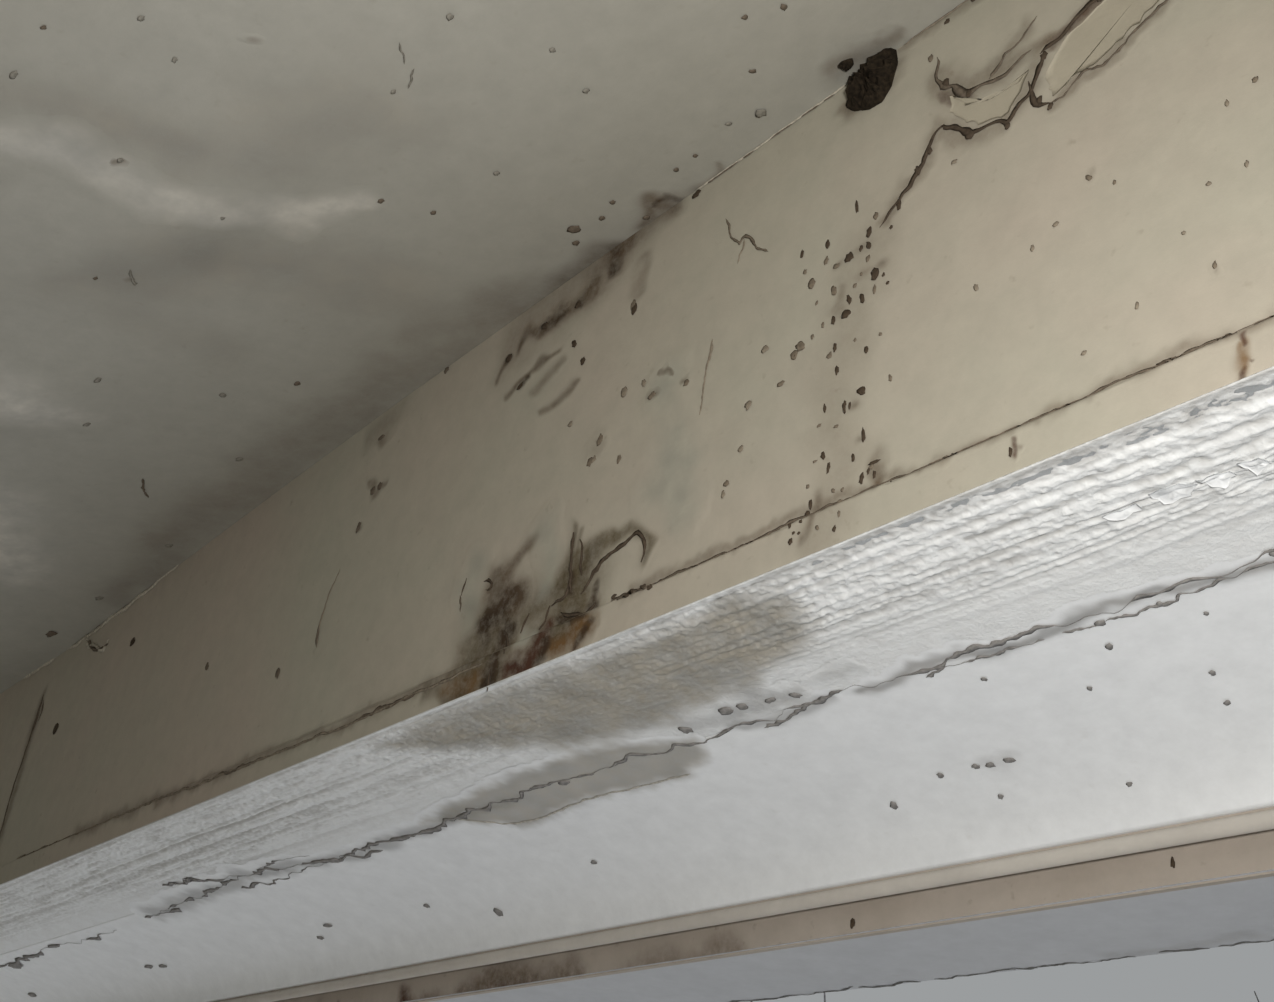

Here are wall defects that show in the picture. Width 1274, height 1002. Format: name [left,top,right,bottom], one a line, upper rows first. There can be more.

crack [879,0,1182,228]
damp [777,176,924,567]
rust [415,491,661,714]
damp [363,581,875,833]
damp [965,743,1031,778]